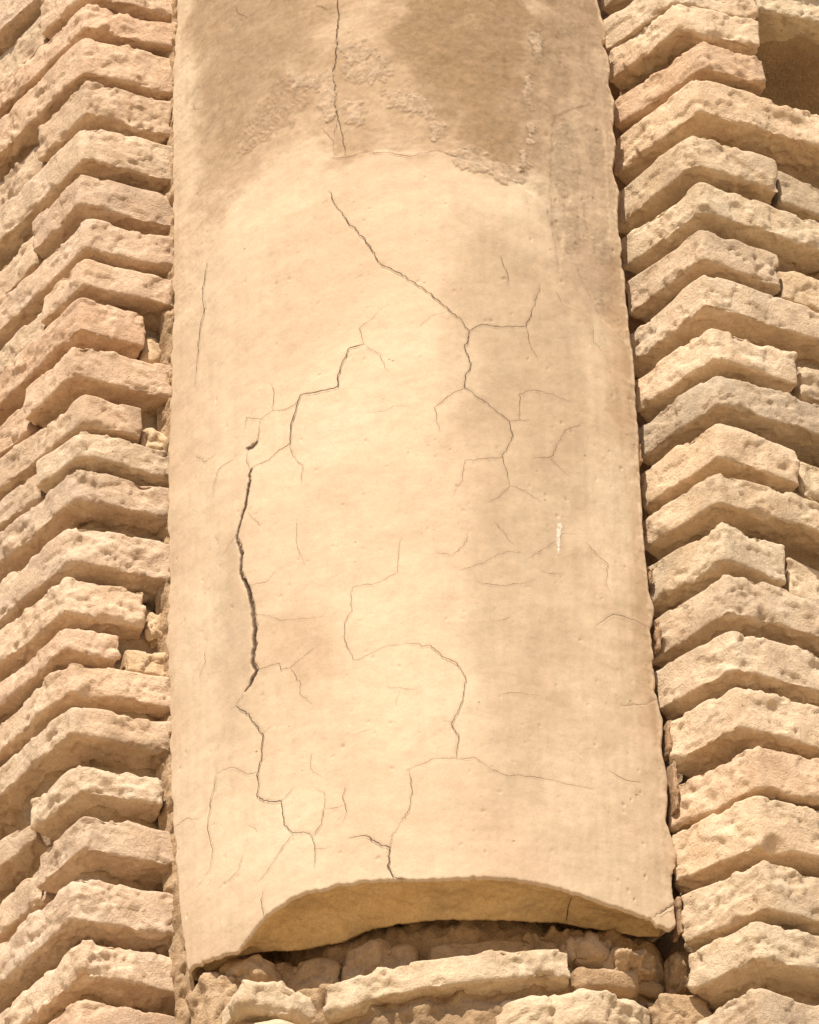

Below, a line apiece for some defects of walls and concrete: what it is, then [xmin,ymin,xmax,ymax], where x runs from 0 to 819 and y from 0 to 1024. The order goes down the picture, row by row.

leakage [189,0,360,175]
crack [317,0,479,165]
leakage [327,0,596,169]
crack [331,193,608,586]
crack [178,311,587,909]